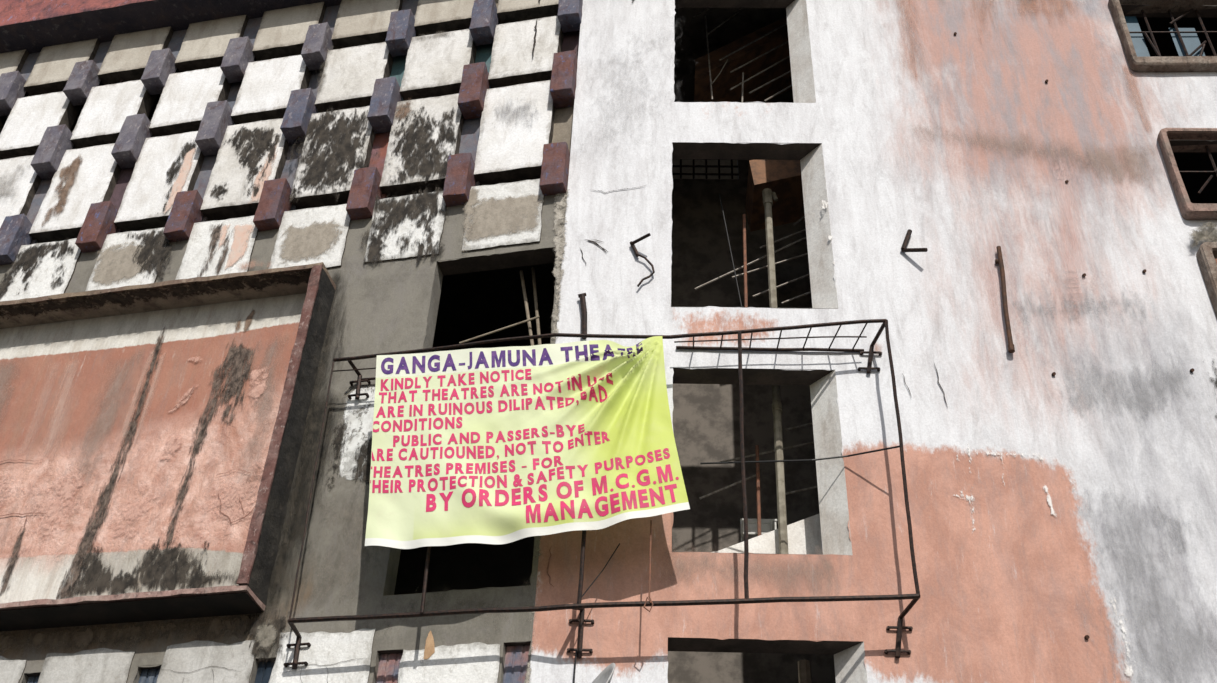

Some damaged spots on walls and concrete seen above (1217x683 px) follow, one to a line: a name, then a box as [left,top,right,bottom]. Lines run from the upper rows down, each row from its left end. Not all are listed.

peeling [164,148,196,213]
leakage [210,183,228,198]
leakage [224,102,460,264]
leakage [0,224,312,319]
peeling [280,221,342,263]
leakage [0,275,372,662]
peeling [339,387,375,480]